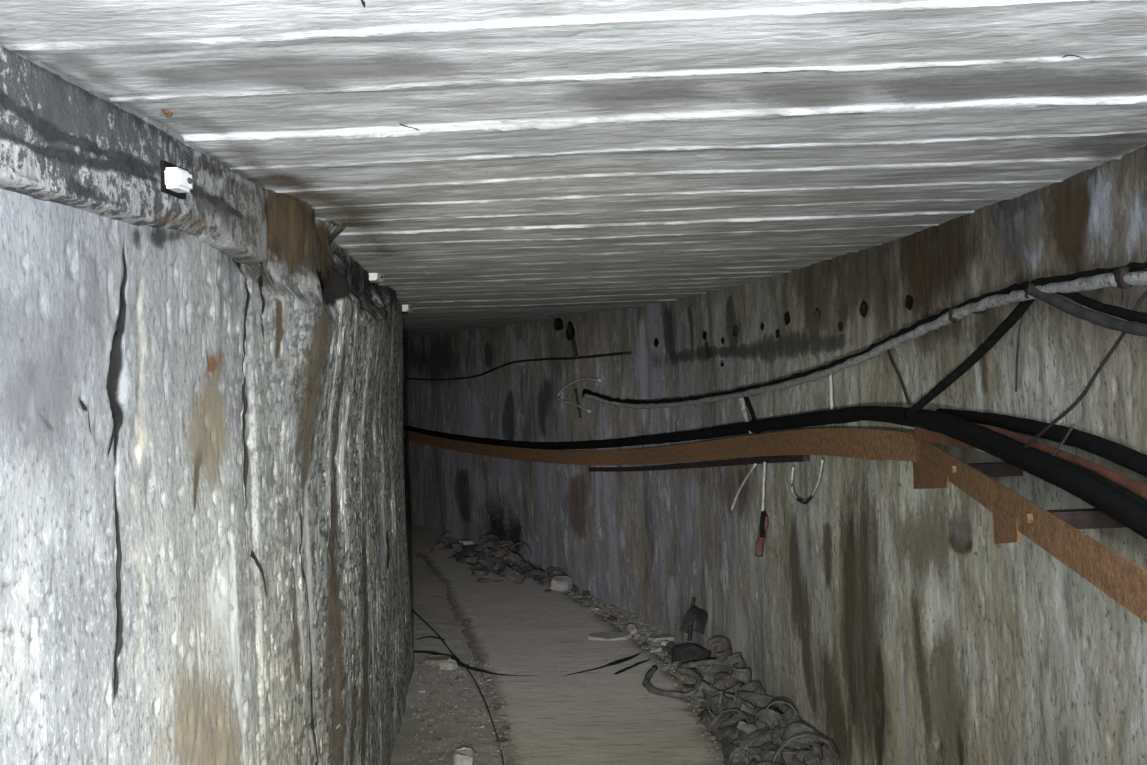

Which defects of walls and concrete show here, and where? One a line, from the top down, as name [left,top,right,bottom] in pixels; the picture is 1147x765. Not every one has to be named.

water stain [1053,135,1147,262]
crack [79,247,147,698]
corrosion [190,354,226,509]
water stain [458,386,486,438]
water stain [455,468,537,566]
water stain [502,391,515,441]
water stain [634,219,978,429]
water stain [897,494,971,579]
water stain [974,308,1001,392]
water stain [728,562,747,664]
water stain [790,483,886,765]
water stain [899,601,966,765]